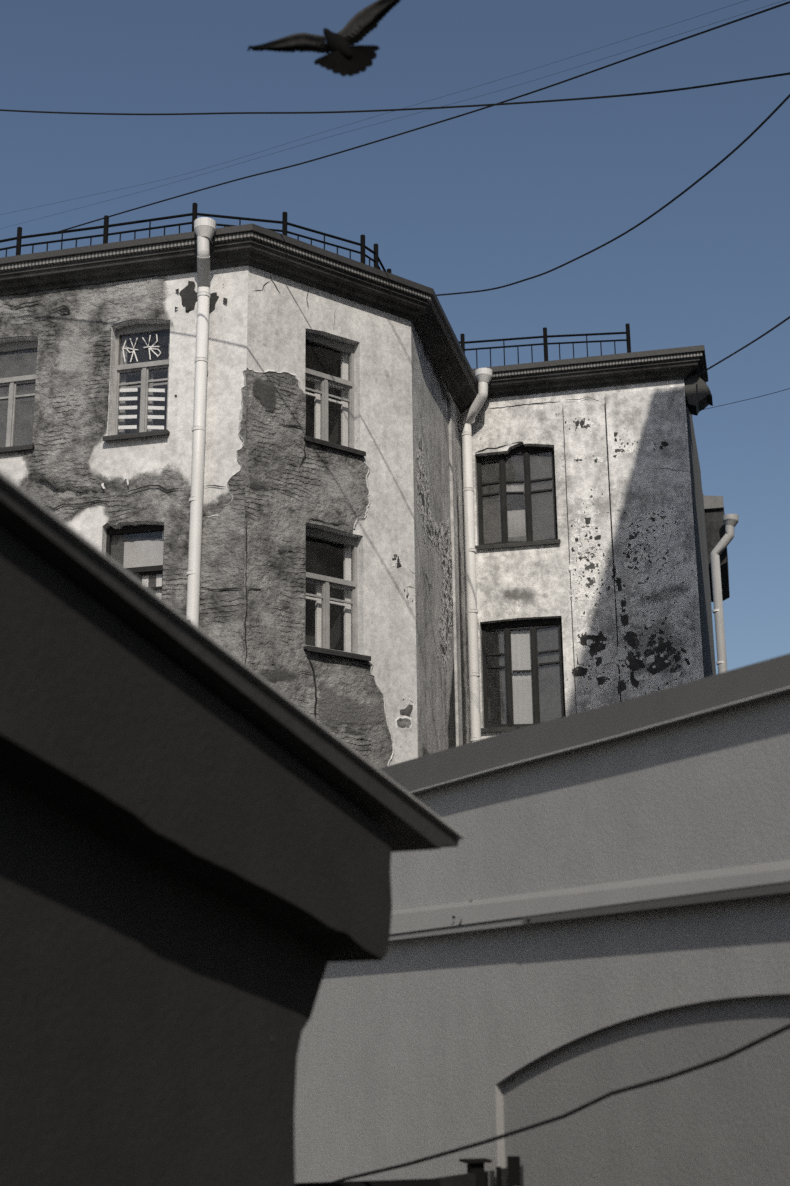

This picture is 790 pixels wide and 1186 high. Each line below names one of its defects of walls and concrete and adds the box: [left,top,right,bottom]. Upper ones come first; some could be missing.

spalling [0,275,414,769]
peeling [564,418,594,431]
peeling [574,432,669,463]
peeling [567,486,698,710]